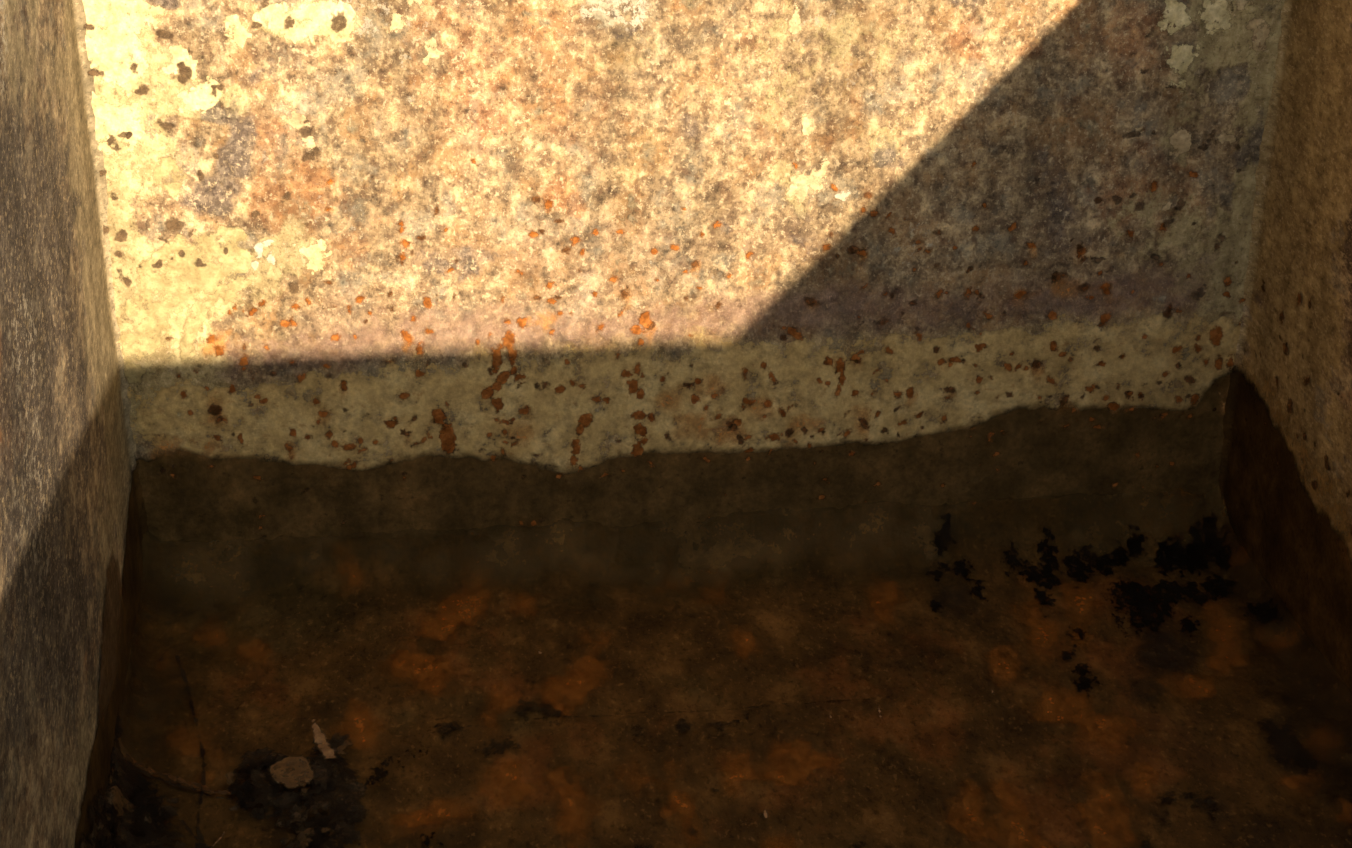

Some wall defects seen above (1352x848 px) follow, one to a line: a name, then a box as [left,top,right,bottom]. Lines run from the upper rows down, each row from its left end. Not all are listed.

peeling [82,0,231,177]
peeling [223,0,358,58]
peeling [280,103,321,162]
peeling [103,218,275,384]
peeling [292,233,332,275]
corrosion [384,401,459,455]
corrosion [476,317,610,479]
corrosion [529,196,564,238]
corrosion [609,276,669,468]
corrosion [682,350,924,465]
corrosion [914,266,1241,429]
water stain [75,313,1352,848]